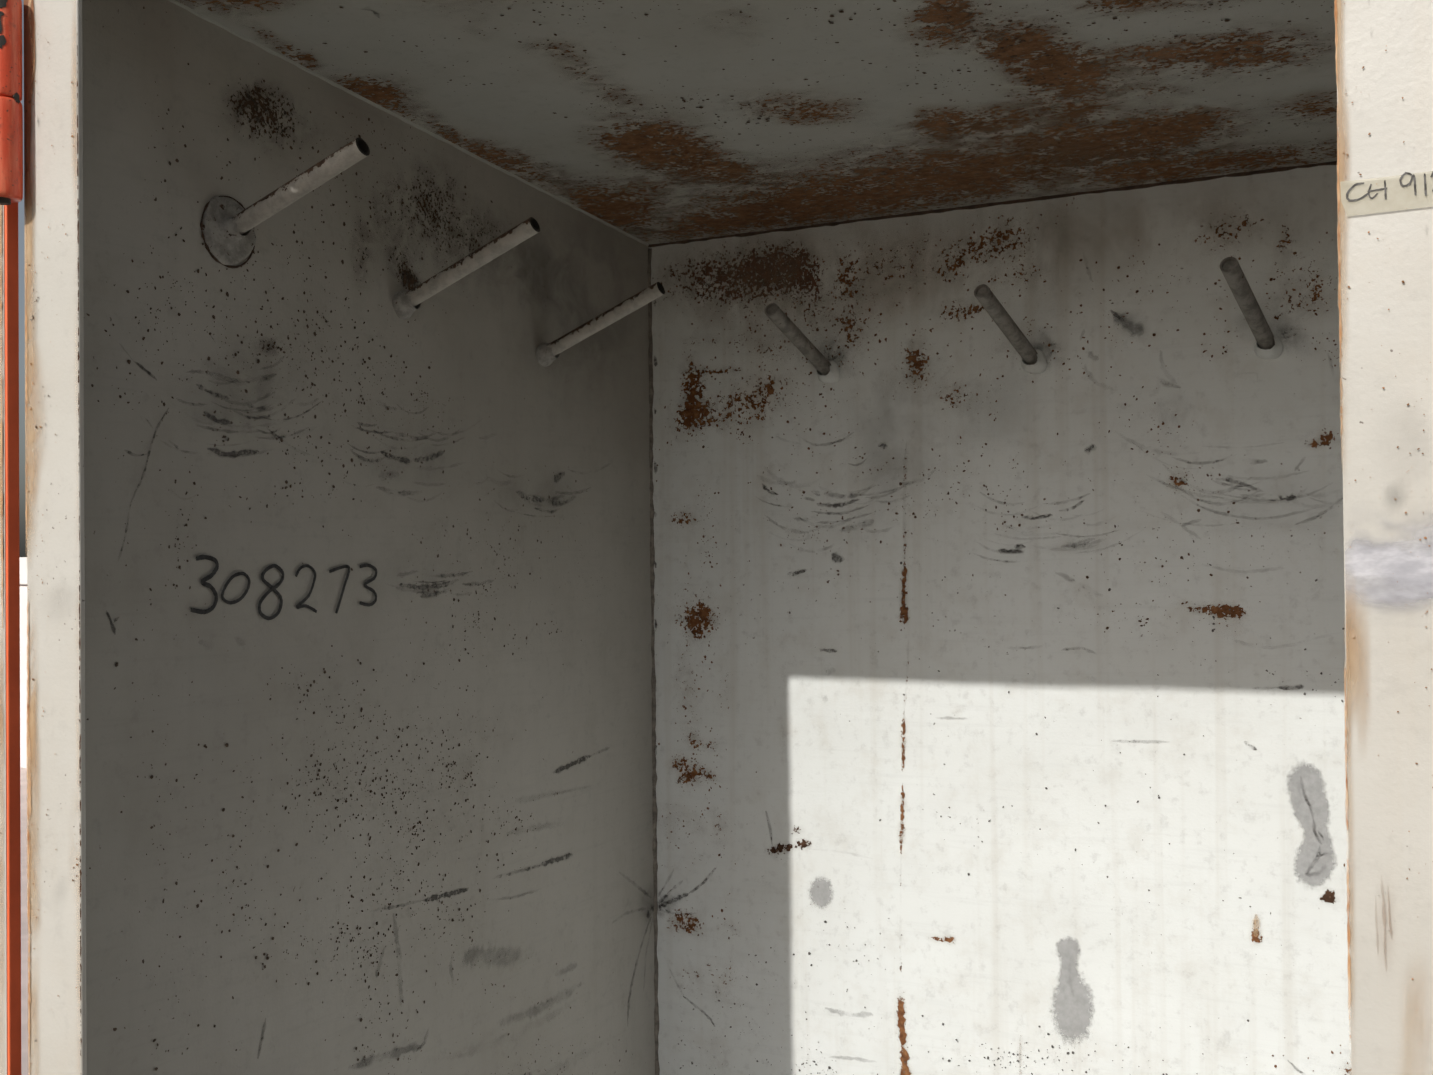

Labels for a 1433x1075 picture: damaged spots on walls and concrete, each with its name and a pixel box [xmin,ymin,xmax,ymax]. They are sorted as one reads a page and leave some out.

corrosion [114,0,1362,631]
corrosion [72,515,91,1055]
corrosion [404,498,576,682]
crack [661,870,713,914]
corrosion [660,479,736,868]
corrosion [899,658,920,854]
corrosion [1086,572,1246,642]
leakage [1289,765,1334,885]
corrosion [928,1026,1096,1075]
leakage [1054,939,1092,1038]